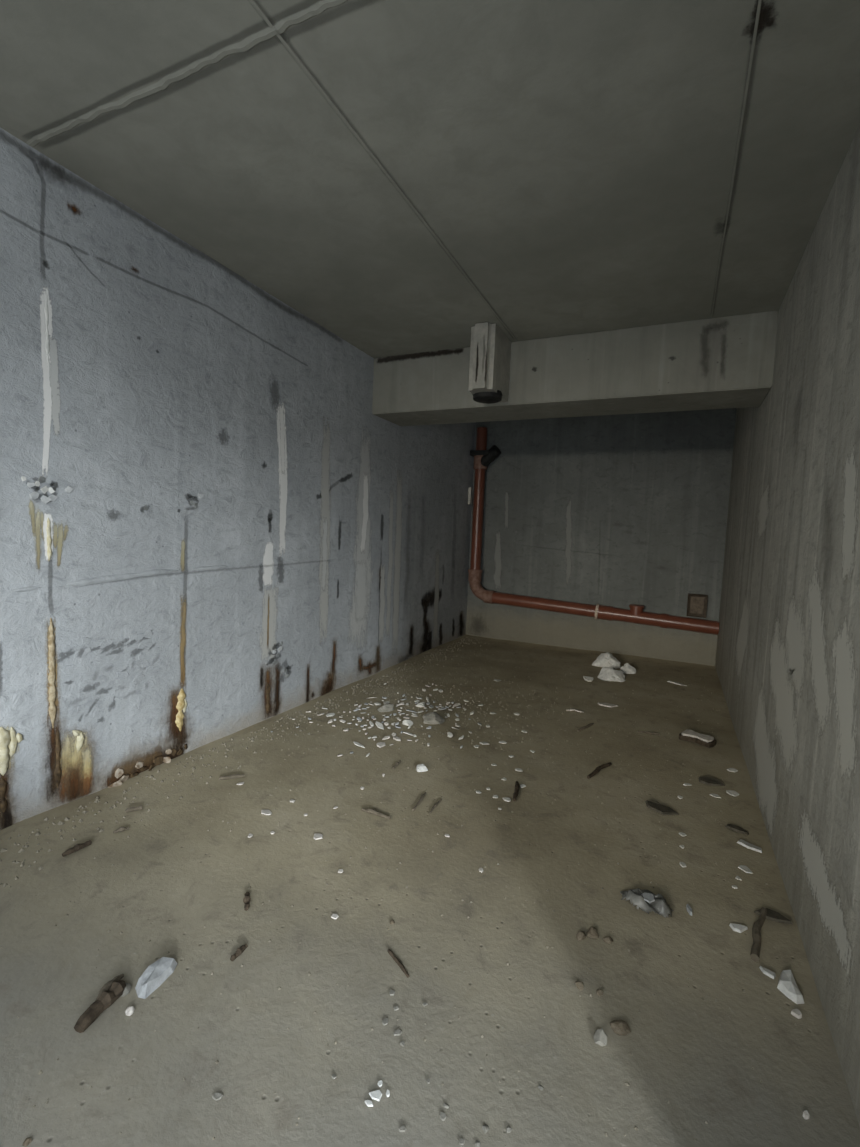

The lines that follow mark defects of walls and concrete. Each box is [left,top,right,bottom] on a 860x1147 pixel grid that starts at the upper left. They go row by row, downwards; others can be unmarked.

spalling [21,476,73,504]
rust [29,500,68,569]
rust [260,513,280,716]
rust [47,618,92,802]
rust [306,644,336,702]
rust [0,727,23,829]